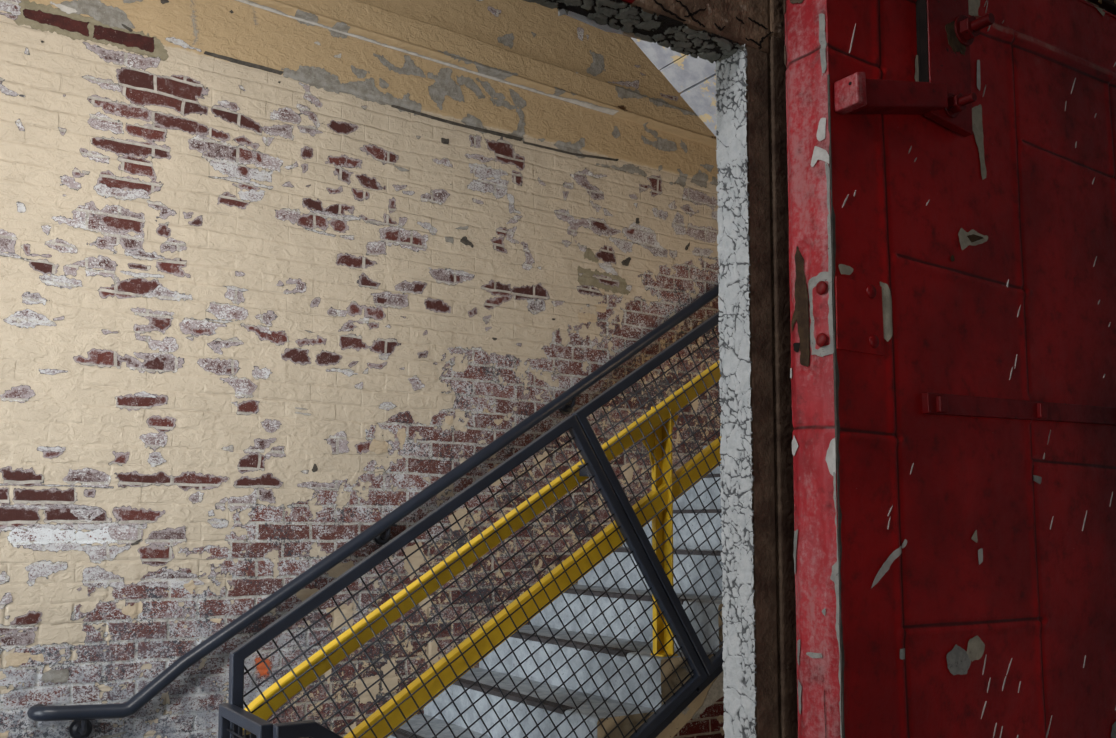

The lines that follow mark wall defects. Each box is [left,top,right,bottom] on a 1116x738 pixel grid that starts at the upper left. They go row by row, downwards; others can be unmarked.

peeling [294,9,350,46]
peeling [524,0,747,116]
peeling [0,42,725,738]
crack [654,0,774,738]
peeling [790,118,853,379]
peeling [946,636,985,675]